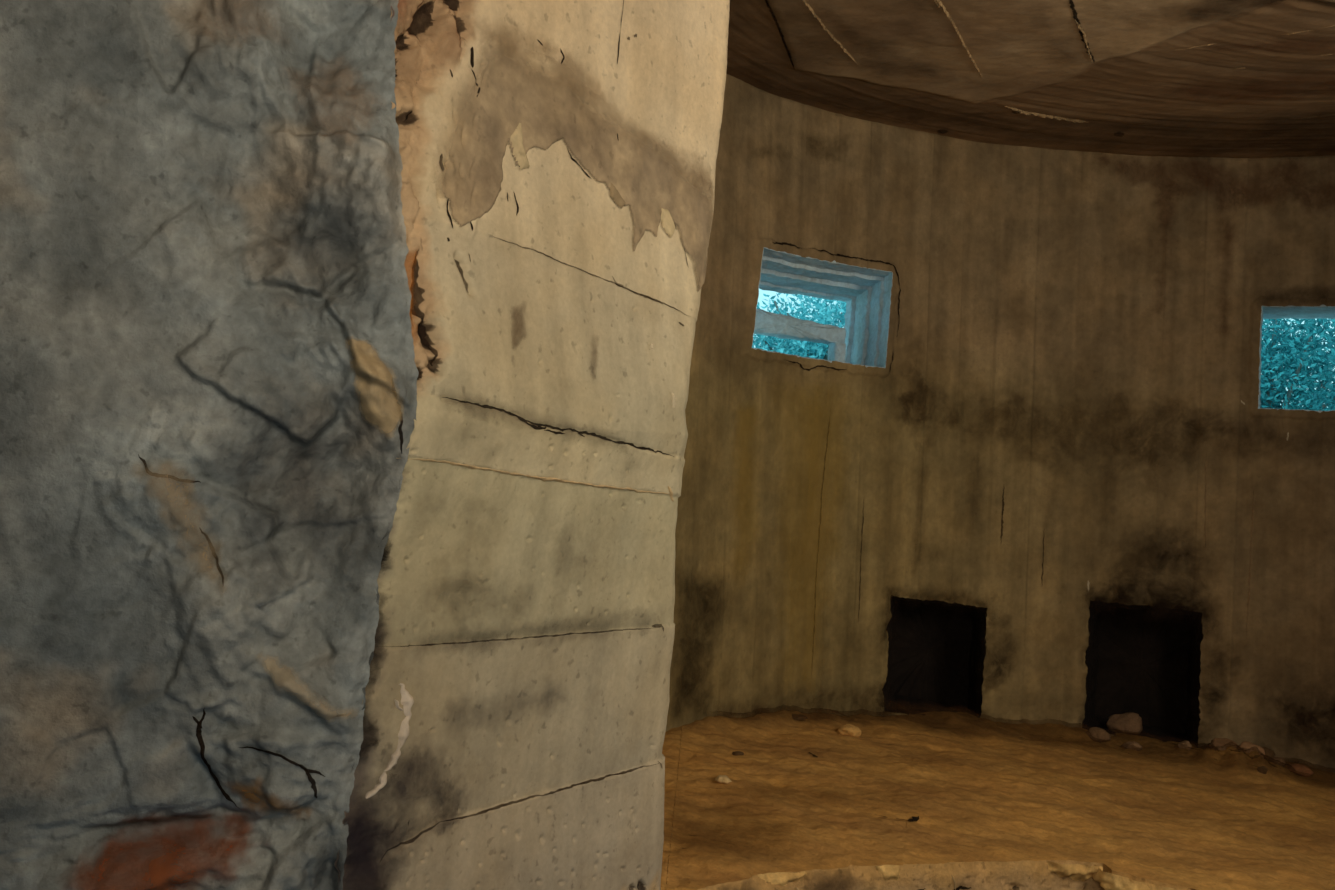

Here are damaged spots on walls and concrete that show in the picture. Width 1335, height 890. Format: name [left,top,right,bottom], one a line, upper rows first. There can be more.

crack [1069,0,1095,62]
peeling [441,52,713,292]
crack [442,397,674,457]
crack [192,708,240,809]
crack [239,746,325,798]